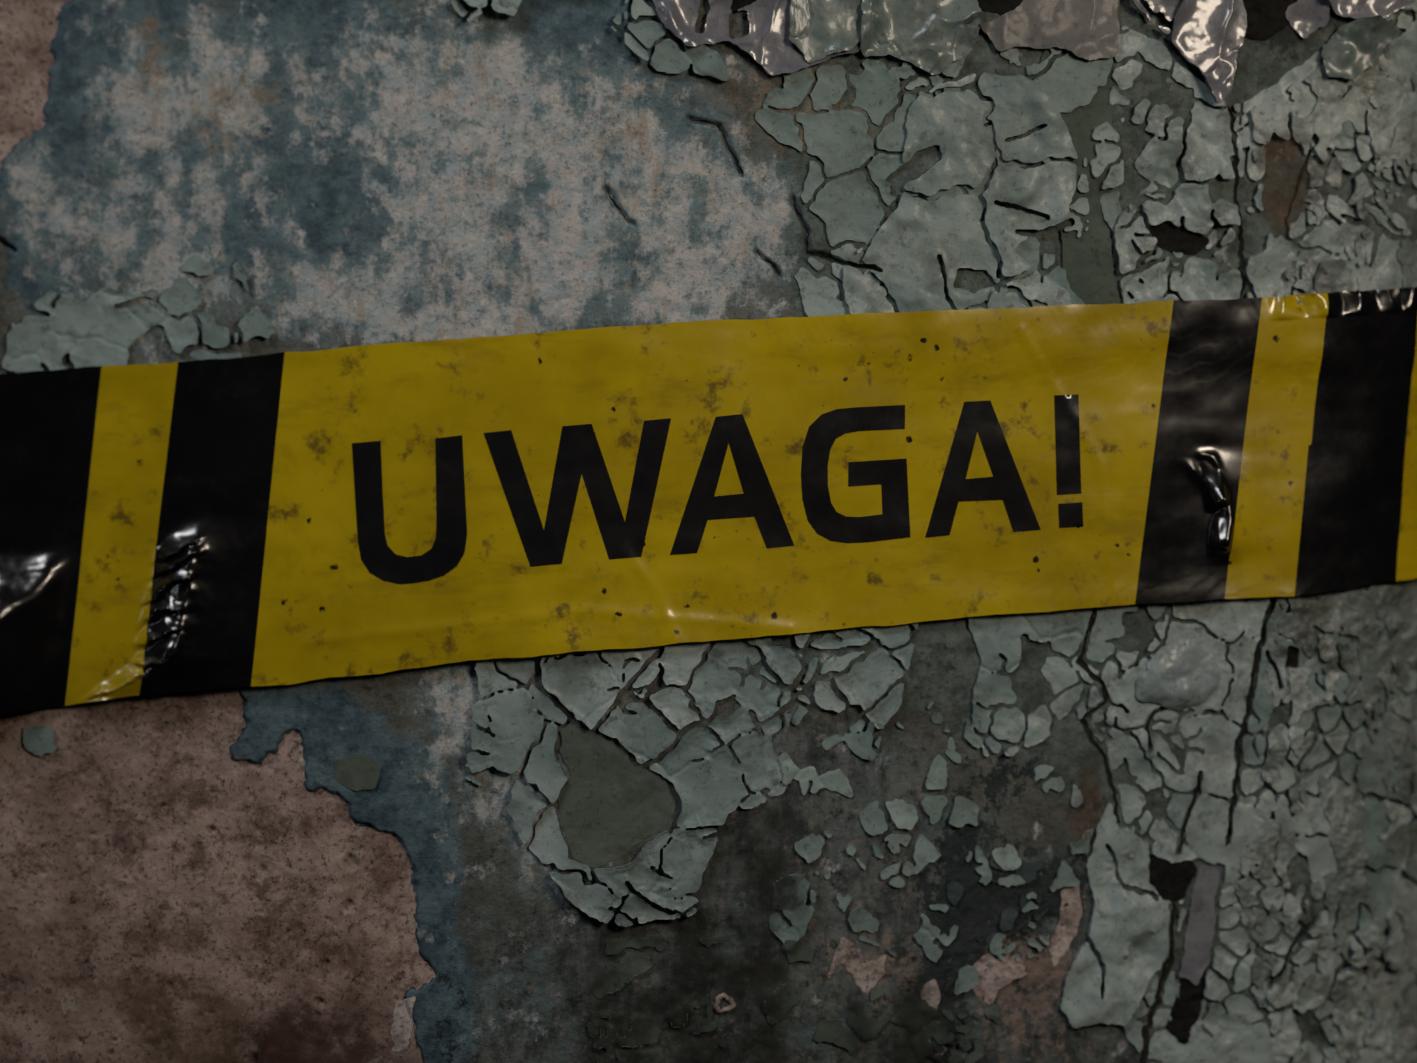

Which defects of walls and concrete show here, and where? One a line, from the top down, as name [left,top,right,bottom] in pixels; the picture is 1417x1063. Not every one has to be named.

spalling [0,0,72,168]
peeling [2,255,275,373]
peeling [451,0,522,22]
peeling [611,0,1417,317]
spalling [0,687,436,1063]
peeling [463,622,918,1063]
peeling [813,583,1417,1063]